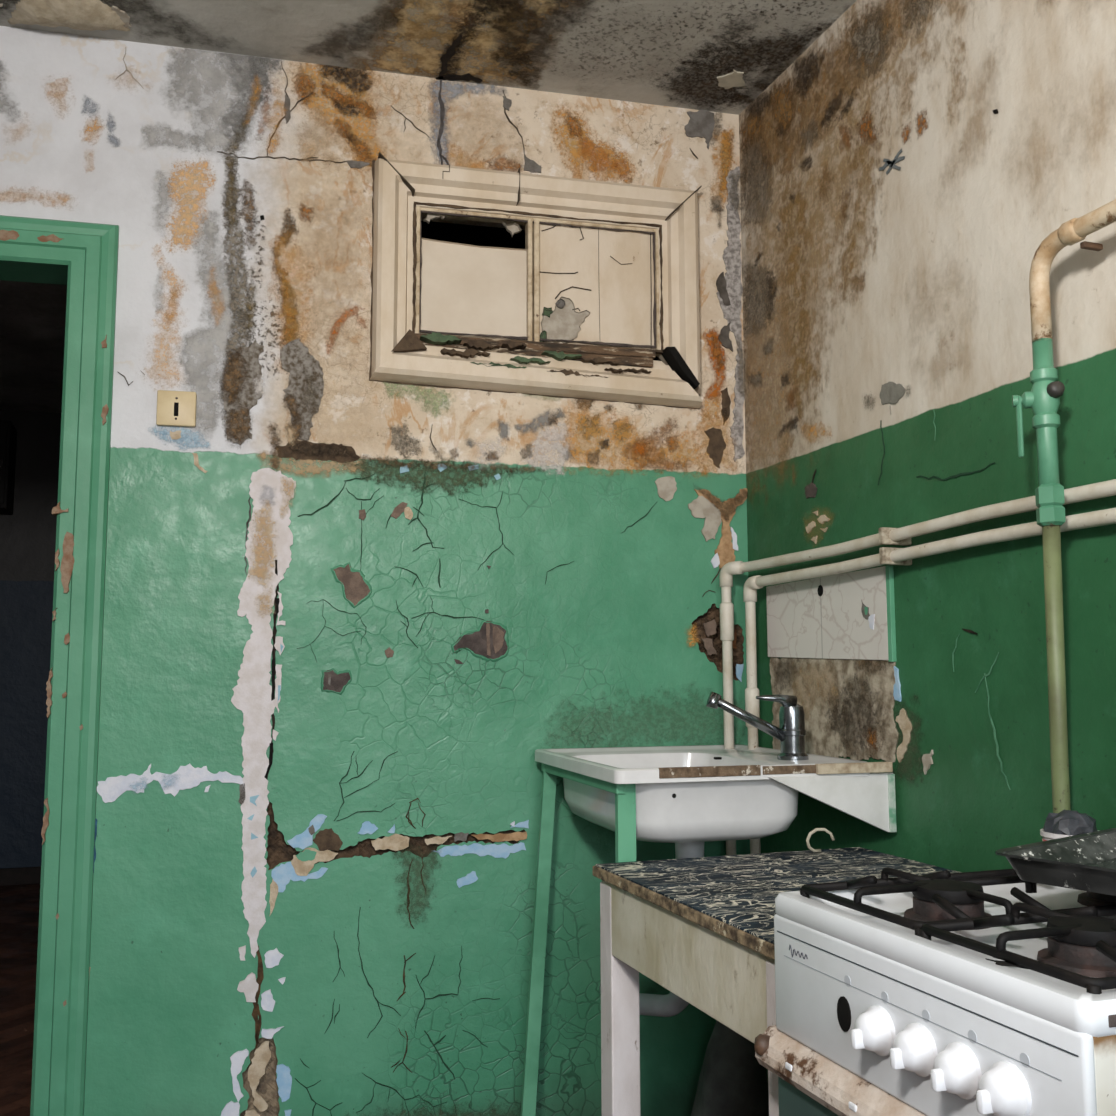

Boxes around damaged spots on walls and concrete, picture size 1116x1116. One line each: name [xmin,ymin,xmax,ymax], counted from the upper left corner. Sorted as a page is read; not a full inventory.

crack [391,35,541,206]
damp [657,0,835,119]
damp [801,90,853,171]
damp [101,0,324,446]
peeling [420,296,651,378]
damp [864,382,910,415]
crack [264,560,366,779]
peeling [97,425,540,1012]
crack [298,473,484,648]
peeling [688,488,748,682]
spalling [221,1026,292,1116]
crack [252,946,264,1049]